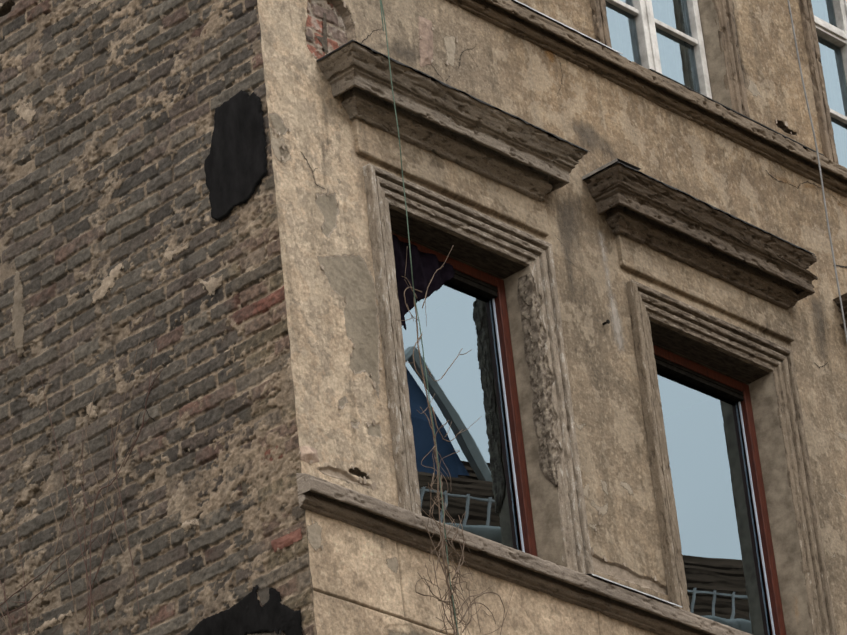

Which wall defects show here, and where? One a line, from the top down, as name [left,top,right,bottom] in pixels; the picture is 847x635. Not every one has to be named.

spalling [0,1,15,17]
flaking render [305,0,356,60]
crack [766,168,845,205]
flaking render [317,465,376,491]